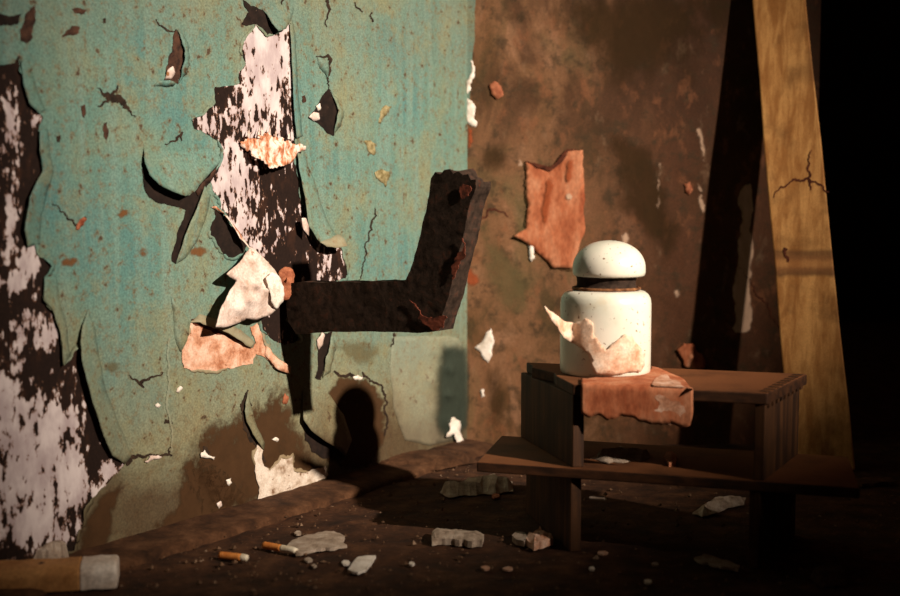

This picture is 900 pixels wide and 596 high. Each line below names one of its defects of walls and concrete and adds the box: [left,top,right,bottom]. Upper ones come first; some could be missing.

crack [98,85,136,117]
peeling [142,0,350,374]
rust [542,177,554,223]
crack [774,150,829,198]
crack [359,208,377,280]
peeling [0,55,132,560]
crack [129,372,164,388]
peeling [245,332,352,499]
crack [334,370,389,436]